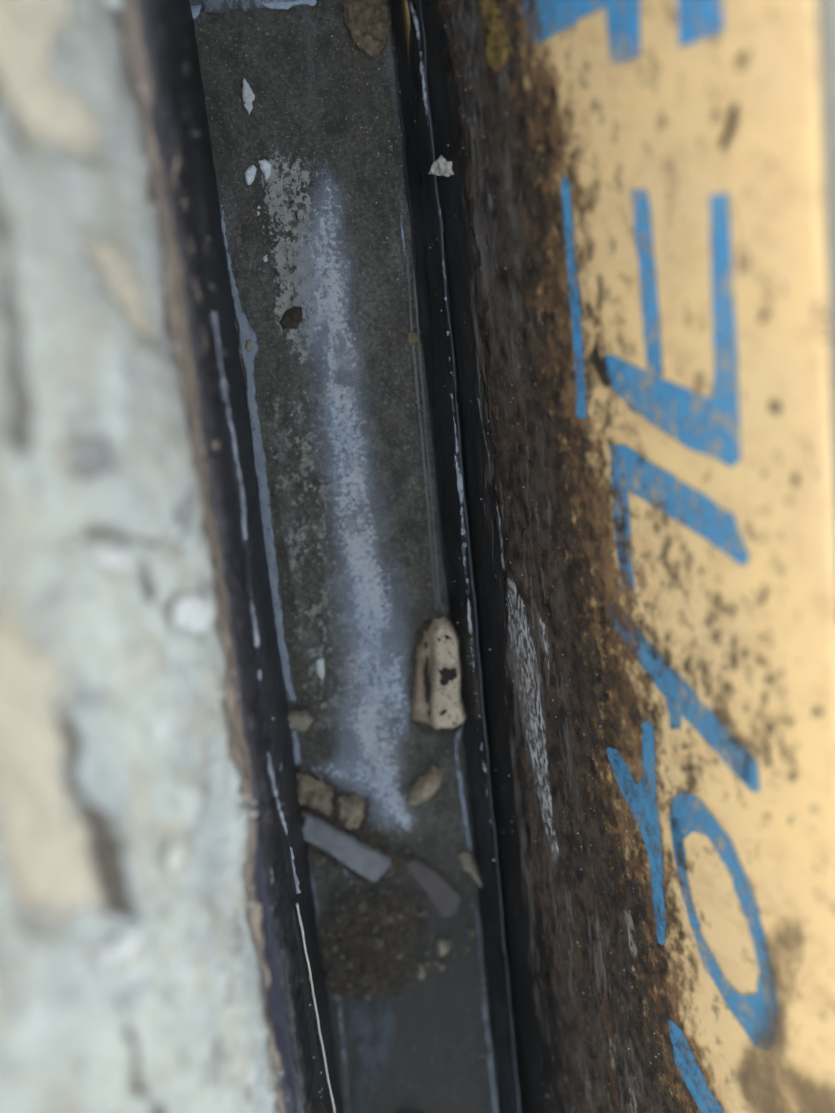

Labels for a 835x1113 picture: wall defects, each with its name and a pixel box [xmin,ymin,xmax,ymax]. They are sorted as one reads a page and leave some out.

leakage [242,78,255,114]
leakage [191,0,317,19]
corrosion [411,3,428,113]
corrosion [478,0,509,72]
leakage [244,143,326,364]
leakage [221,204,394,743]
corrosion [453,416,468,582]
leakage [412,0,795,1113]
leakage [292,730,301,765]
leakage [735,927,835,1113]